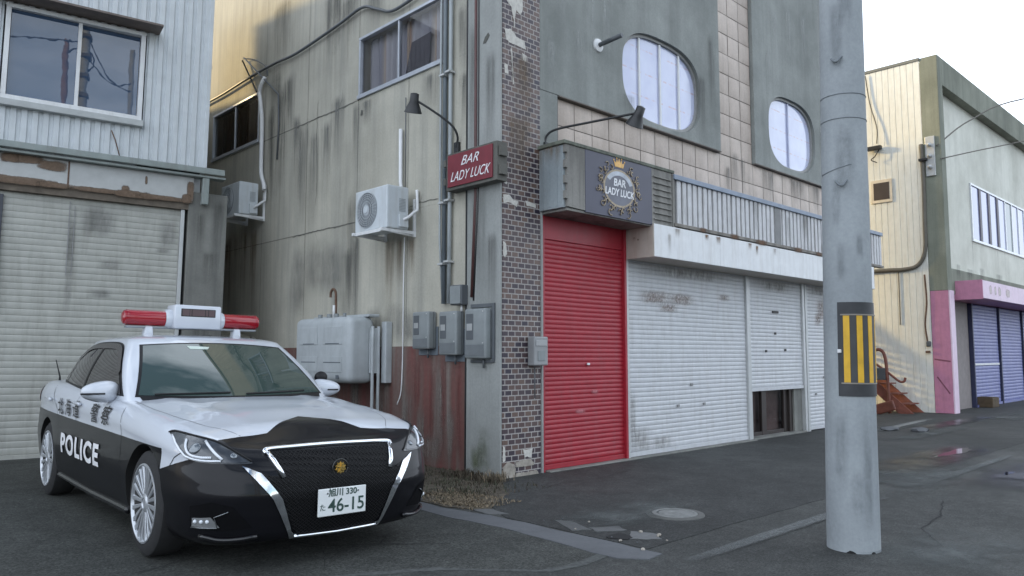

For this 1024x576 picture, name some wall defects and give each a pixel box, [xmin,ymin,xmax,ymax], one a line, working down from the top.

spalling [504,0,527,62]
peeling [0,153,182,202]